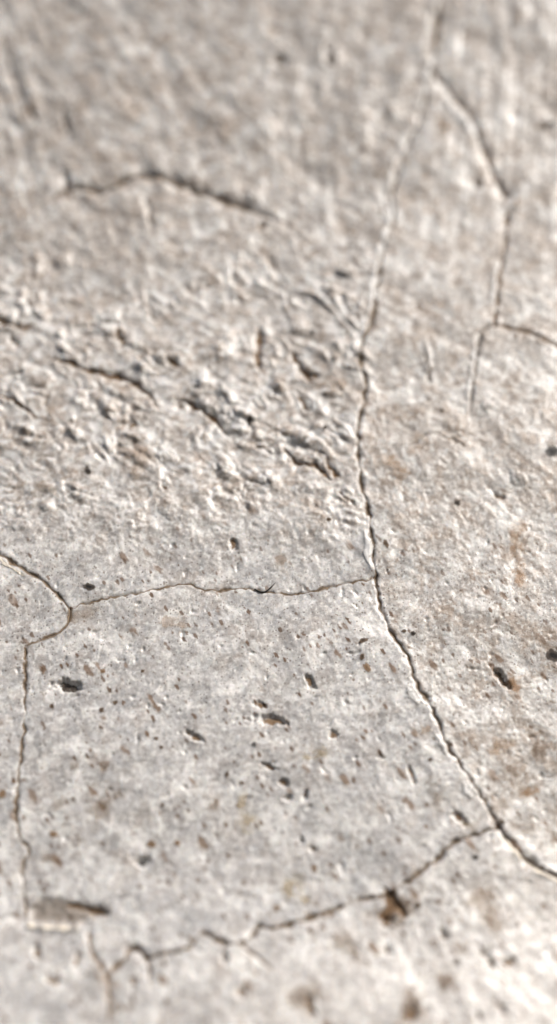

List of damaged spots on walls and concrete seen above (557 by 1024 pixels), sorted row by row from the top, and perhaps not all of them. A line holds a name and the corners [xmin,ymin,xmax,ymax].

crack [51,171,268,218]
crack [406,1,557,411]
crack [0,184,395,917]
crack [88,628,557,1023]